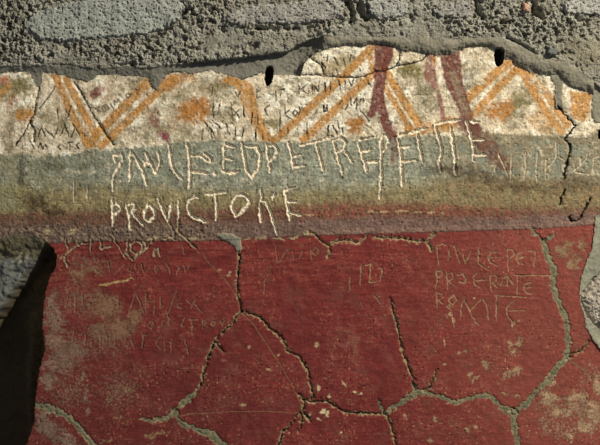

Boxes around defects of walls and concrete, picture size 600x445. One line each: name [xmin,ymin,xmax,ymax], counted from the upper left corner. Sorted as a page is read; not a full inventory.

hole [264,66,274,86]
spalling [473,49,505,85]
crack [557,106,590,223]
spalling [580,272,600,329]
spalling [0,229,142,445]
crack [139,227,598,445]
crack [35,401,97,445]